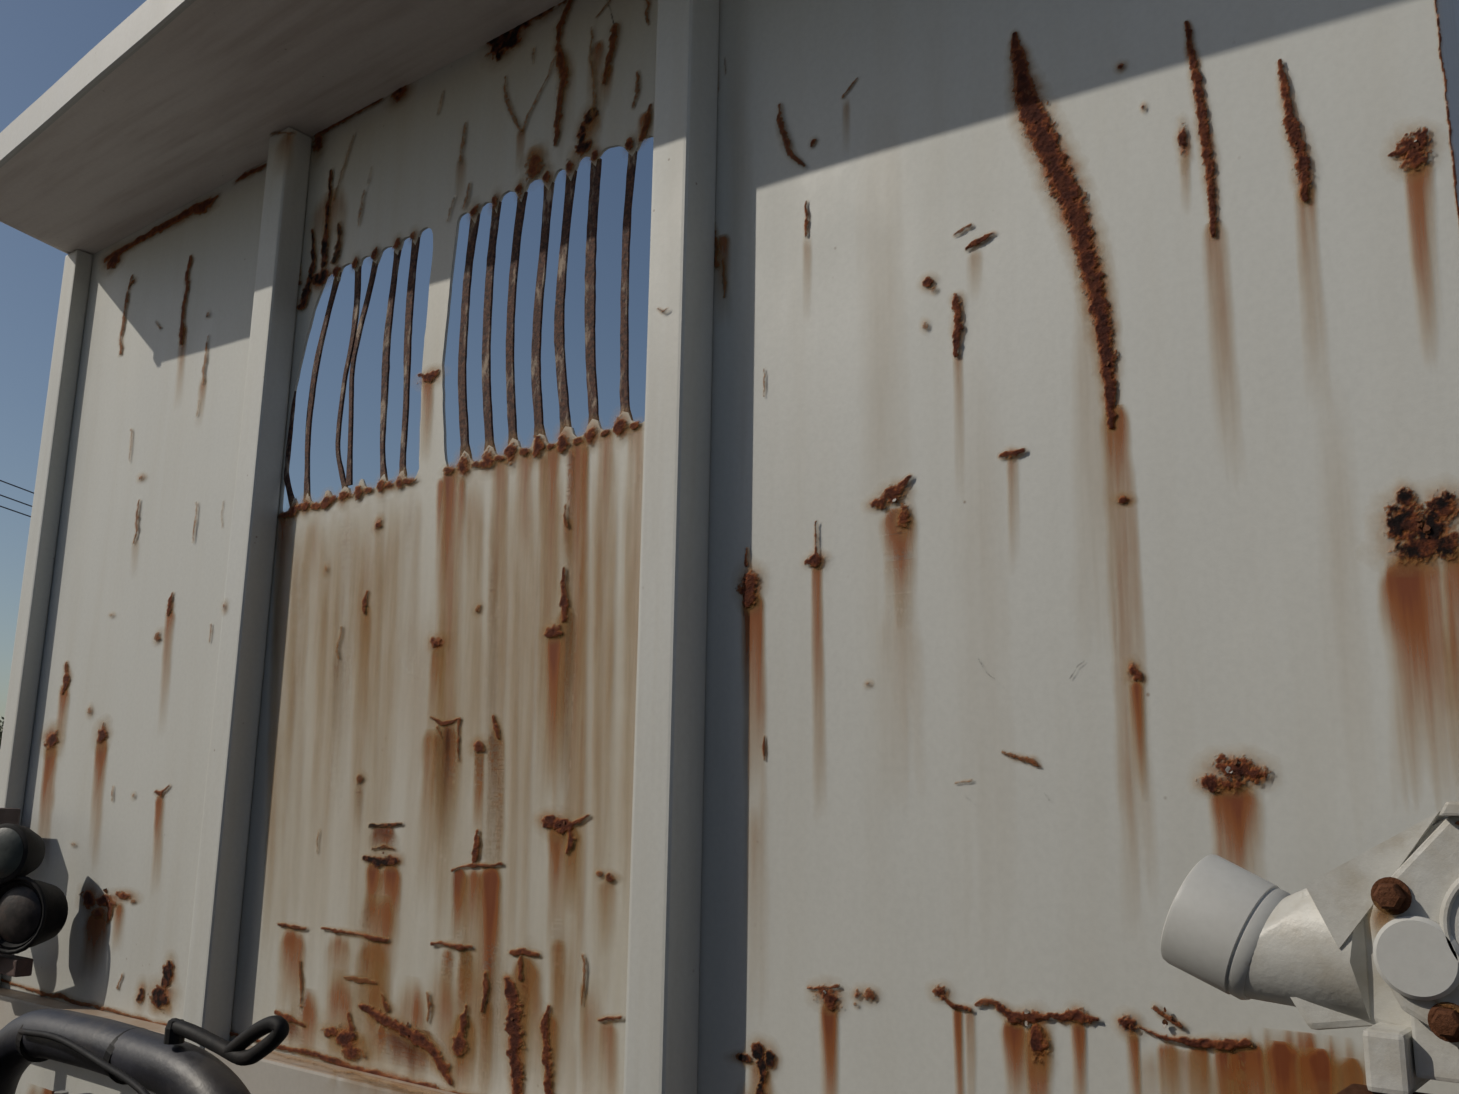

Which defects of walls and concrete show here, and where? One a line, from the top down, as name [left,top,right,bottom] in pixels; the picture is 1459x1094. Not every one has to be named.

corrosion [1177,21,1218,254]
corrosion [1277,59,1313,216]
corrosion [1387,0,1459,286]
corrosion [1009,32,1130,504]
corrosion [277,475,416,566]
corrosion [430,414,640,743]
corrosion [736,548,763,718]
corrosion [1383,486,1459,708]
corrosion [1196,753,1271,867]
corrosion [274,942,562,1094]
corrosion [807,984,876,1094]
corrosion [932,984,1365,1094]